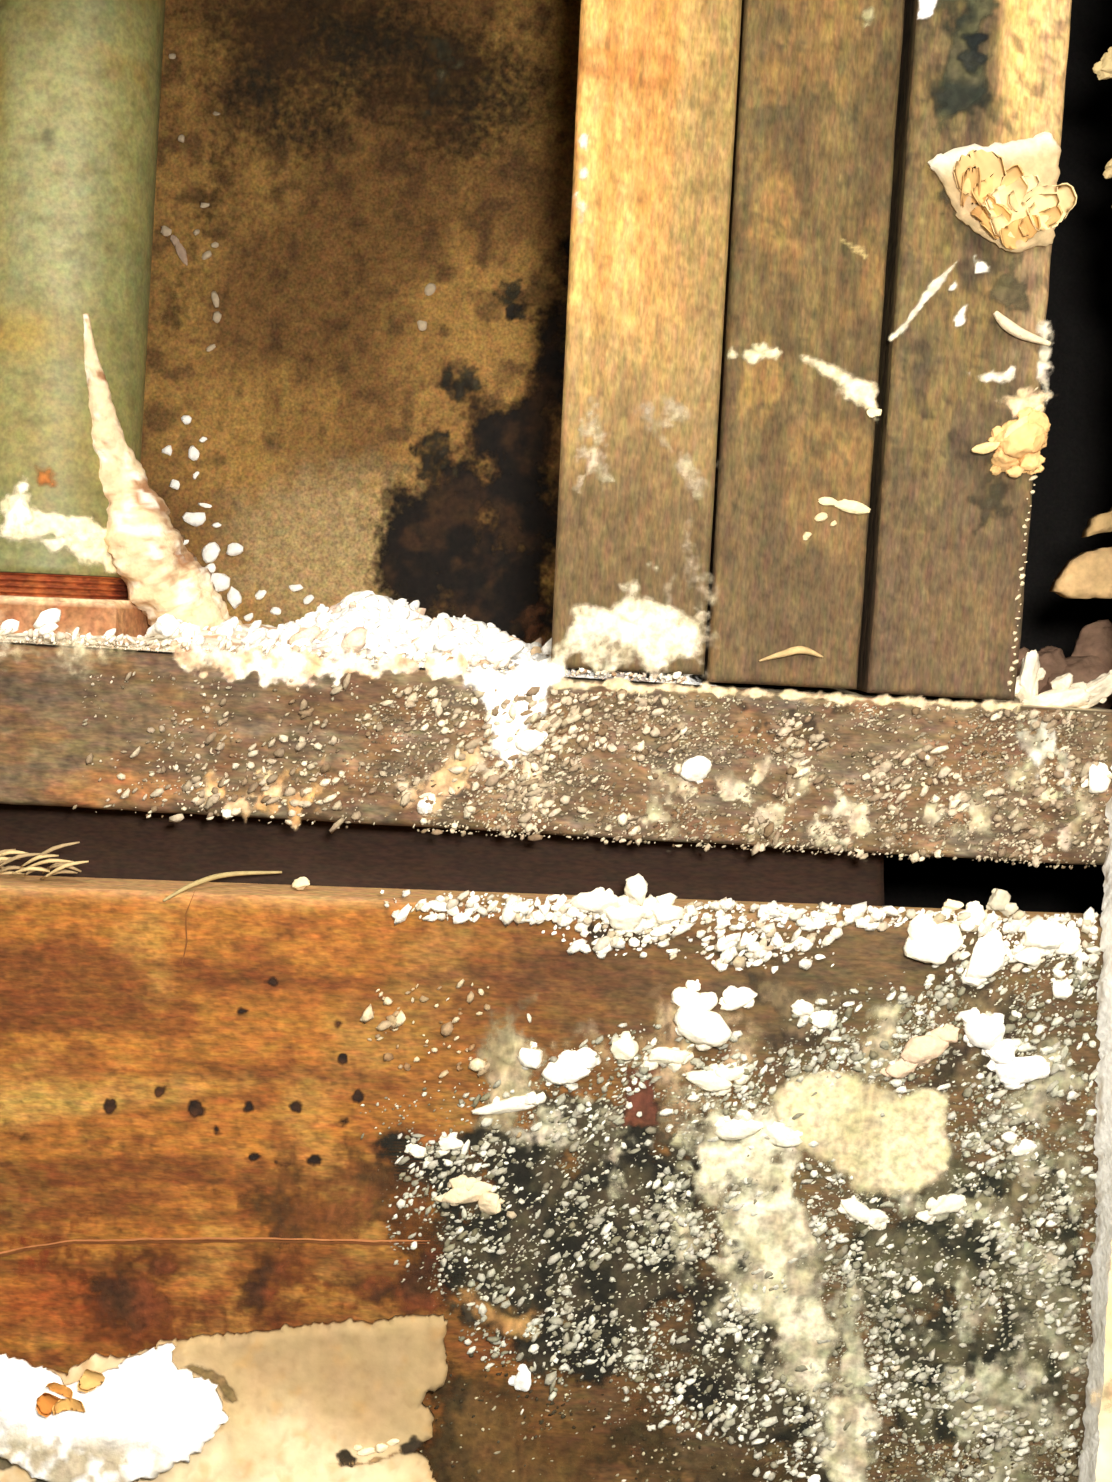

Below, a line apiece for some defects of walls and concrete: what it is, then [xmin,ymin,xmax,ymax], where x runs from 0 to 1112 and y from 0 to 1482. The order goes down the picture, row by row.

damp [373,236,570,646]
damp [104,672,1109,869]
damp [587,922,608,946]
damp [84,1250,205,1349]
crack [0,1237,431,1257]
damp [224,942,1102,1482]